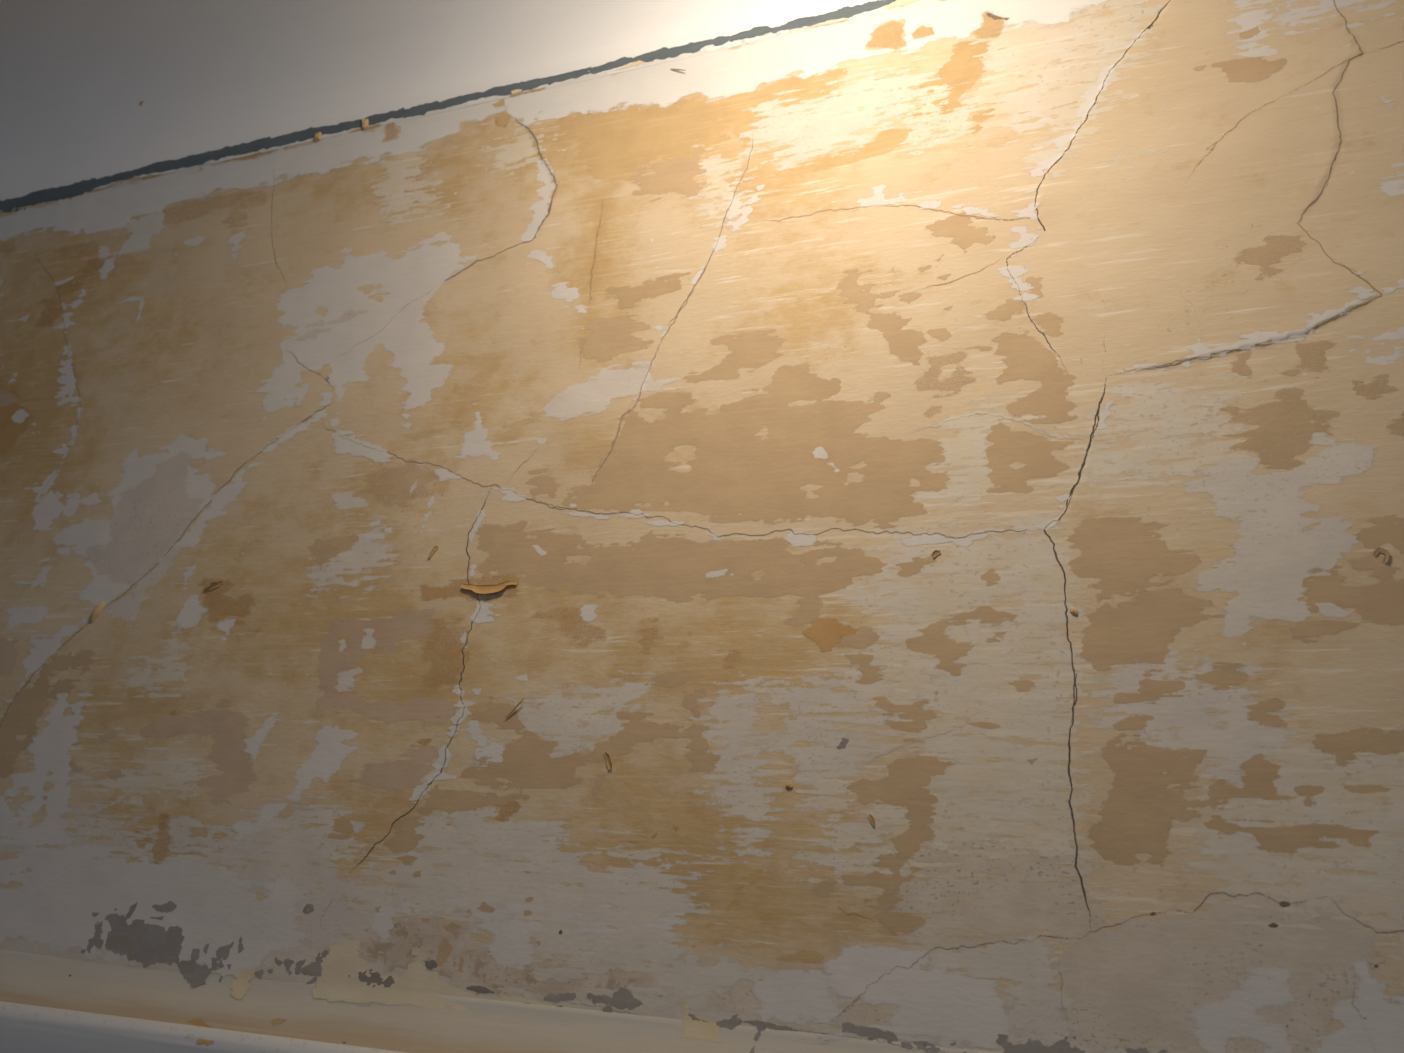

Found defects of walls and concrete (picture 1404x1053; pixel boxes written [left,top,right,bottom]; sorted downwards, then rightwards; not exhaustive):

peeling [0,0,935,213]
peeling [777,11,1009,177]
crack [34,250,86,494]
flaking render [256,232,476,430]
peeling [455,250,952,628]
crack [163,0,1404,921]
peeling [836,269,1078,500]
flaking render [0,434,236,847]
flaking render [1066,340,1404,866]
flaking render [81,901,244,987]
flaking render [688,622,1085,1053]
crack [836,892,1311,1018]